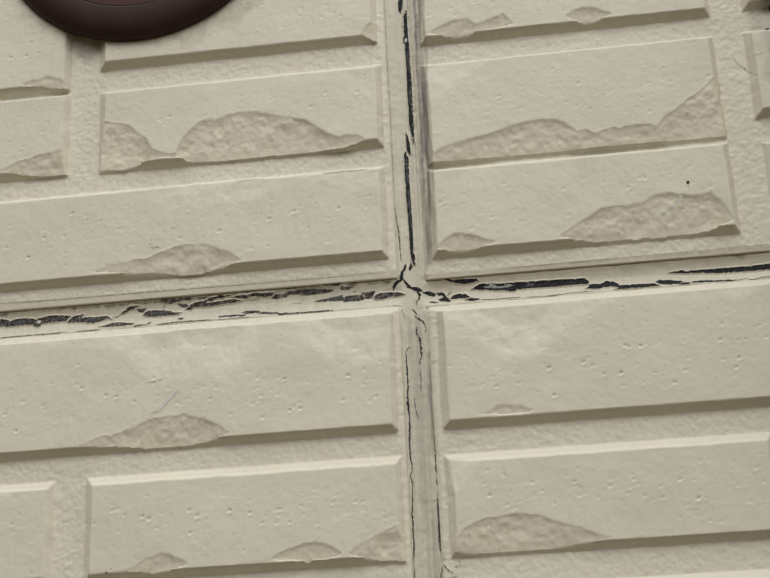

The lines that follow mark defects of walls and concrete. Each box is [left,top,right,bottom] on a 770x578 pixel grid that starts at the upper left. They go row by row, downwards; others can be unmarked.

spalling [432,14,511,37]
spalling [0,150,68,177]
spalling [98,112,364,172]
spalling [431,77,729,162]
crack [0,0,770,388]
spalling [559,193,733,241]
spalling [96,240,239,276]
spalling [79,389,227,449]
crack [405,347,419,578]
crack [433,436,441,550]
spalling [352,523,407,561]
spalling [442,513,610,578]